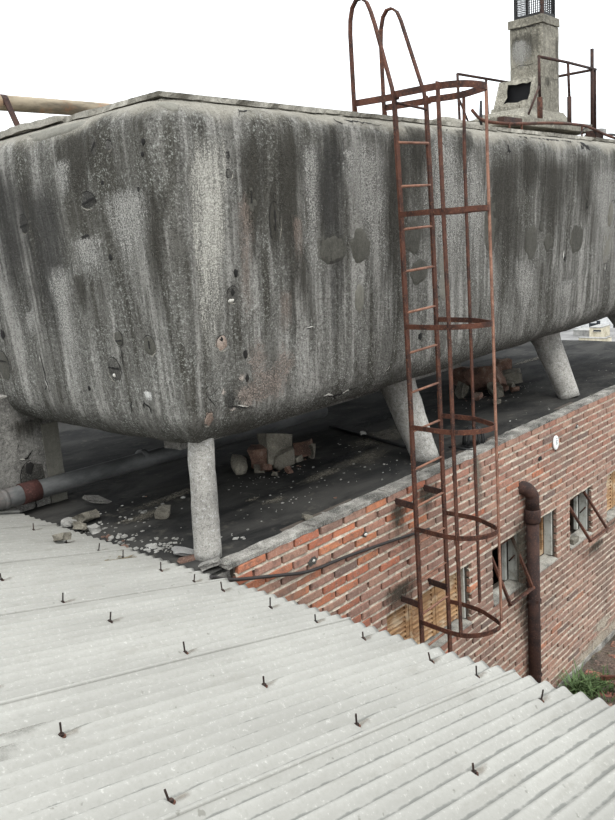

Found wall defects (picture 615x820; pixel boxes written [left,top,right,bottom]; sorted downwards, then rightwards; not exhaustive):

damp [56,133,90,193]
damp [0,180,101,379]
damp [106,190,161,273]
damp [190,140,227,345]
damp [240,127,484,312]
damp [491,146,615,316]
spalling [107,356,122,383]
spalling [113,330,124,347]
spalling [142,335,156,357]
spalling [215,335,227,352]